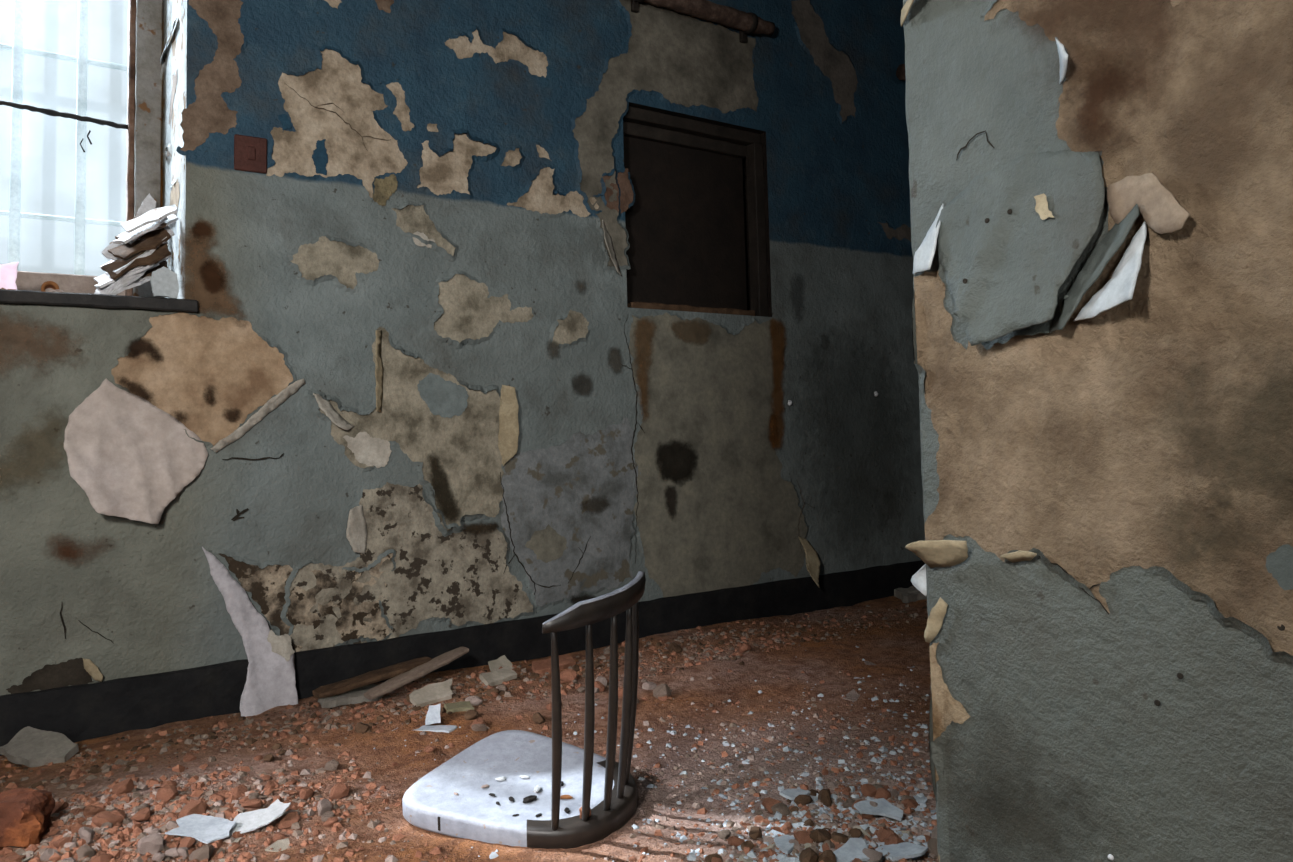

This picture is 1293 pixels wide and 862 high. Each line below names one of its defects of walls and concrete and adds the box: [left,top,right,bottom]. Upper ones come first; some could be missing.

flaking render [160,0,248,165]
flaking render [266,0,758,352]
damp [0,315,77,365]
damp [119,378,151,401]
damp [127,338,162,361]
damp [205,387,239,422]
flaking render [878,0,1293,802]
spalling [63,311,535,717]